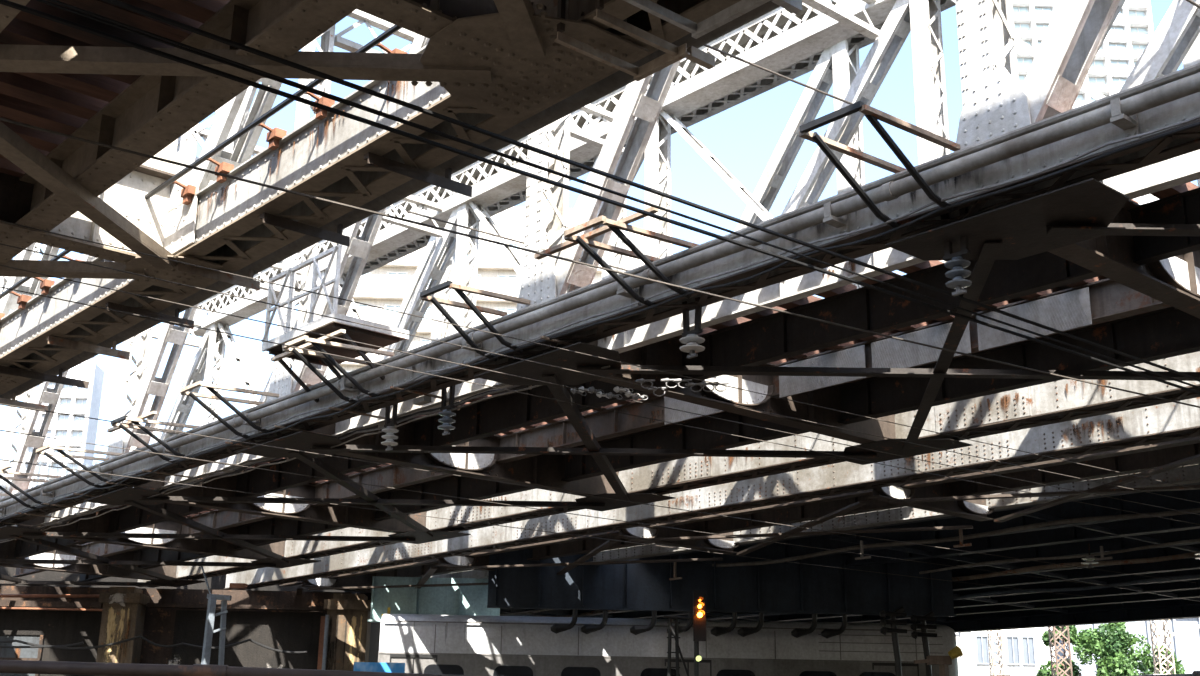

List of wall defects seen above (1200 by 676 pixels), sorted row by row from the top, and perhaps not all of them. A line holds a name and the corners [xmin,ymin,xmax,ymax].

corrosion [269,110,344,179]
corrosion [975,393,1019,409]
corrosion [1063,417,1123,440]